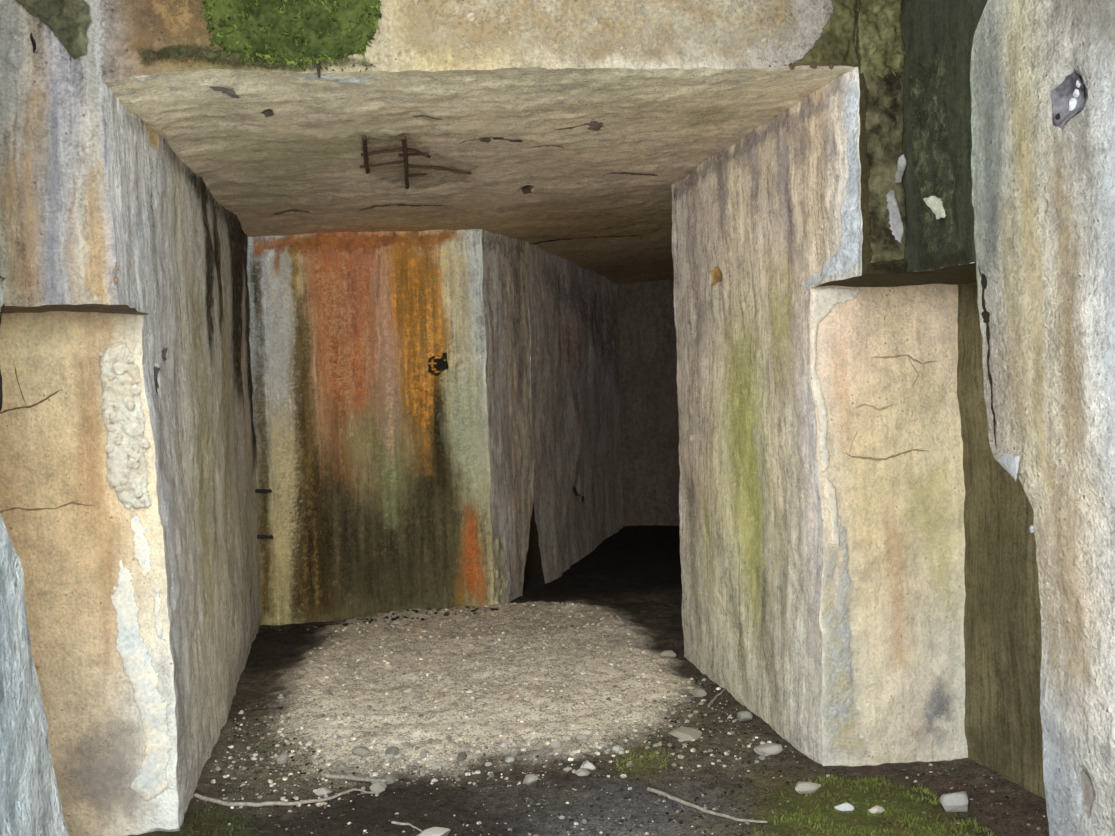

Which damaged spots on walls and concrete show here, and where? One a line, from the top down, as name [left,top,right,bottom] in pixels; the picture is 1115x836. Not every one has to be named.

peeling [885,154,907,244]
peeling [923,196,946,219]
crack [0,365,60,414]
water stain [171,148,460,618]
crack [845,355,937,461]
crack [979,268,997,450]
crack [0,501,95,514]
corrosion [458,512,485,607]